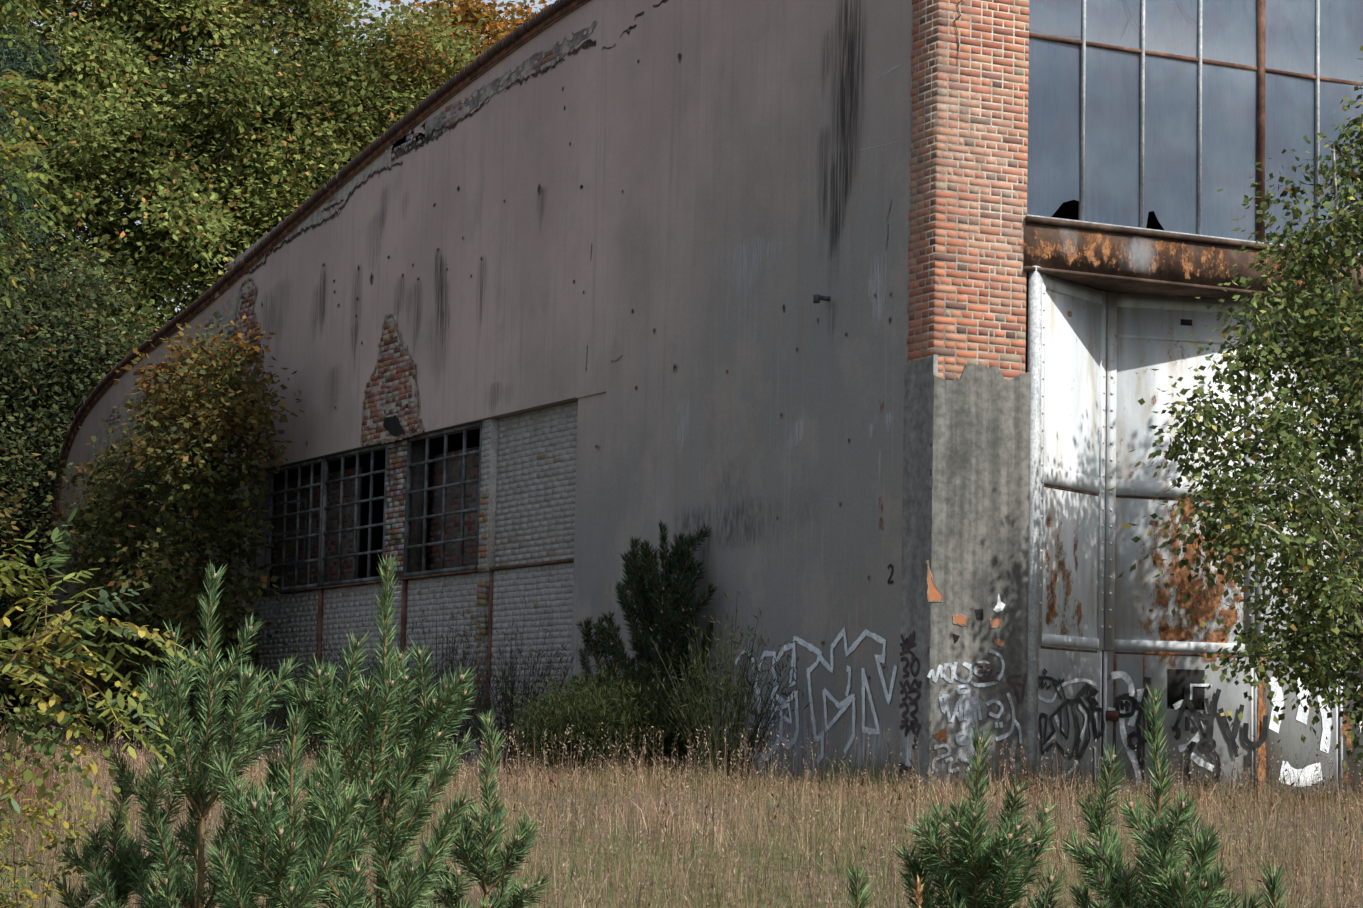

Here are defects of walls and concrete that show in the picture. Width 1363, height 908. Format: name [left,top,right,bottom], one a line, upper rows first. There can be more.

crack [954,0,966,65]
crack [244,0,668,274]
leakage [822,1,860,241]
peeling [85,20,598,497]
rust [1024,231,1229,279]
rust [1045,509,1083,647]
rust [1137,496,1245,669]